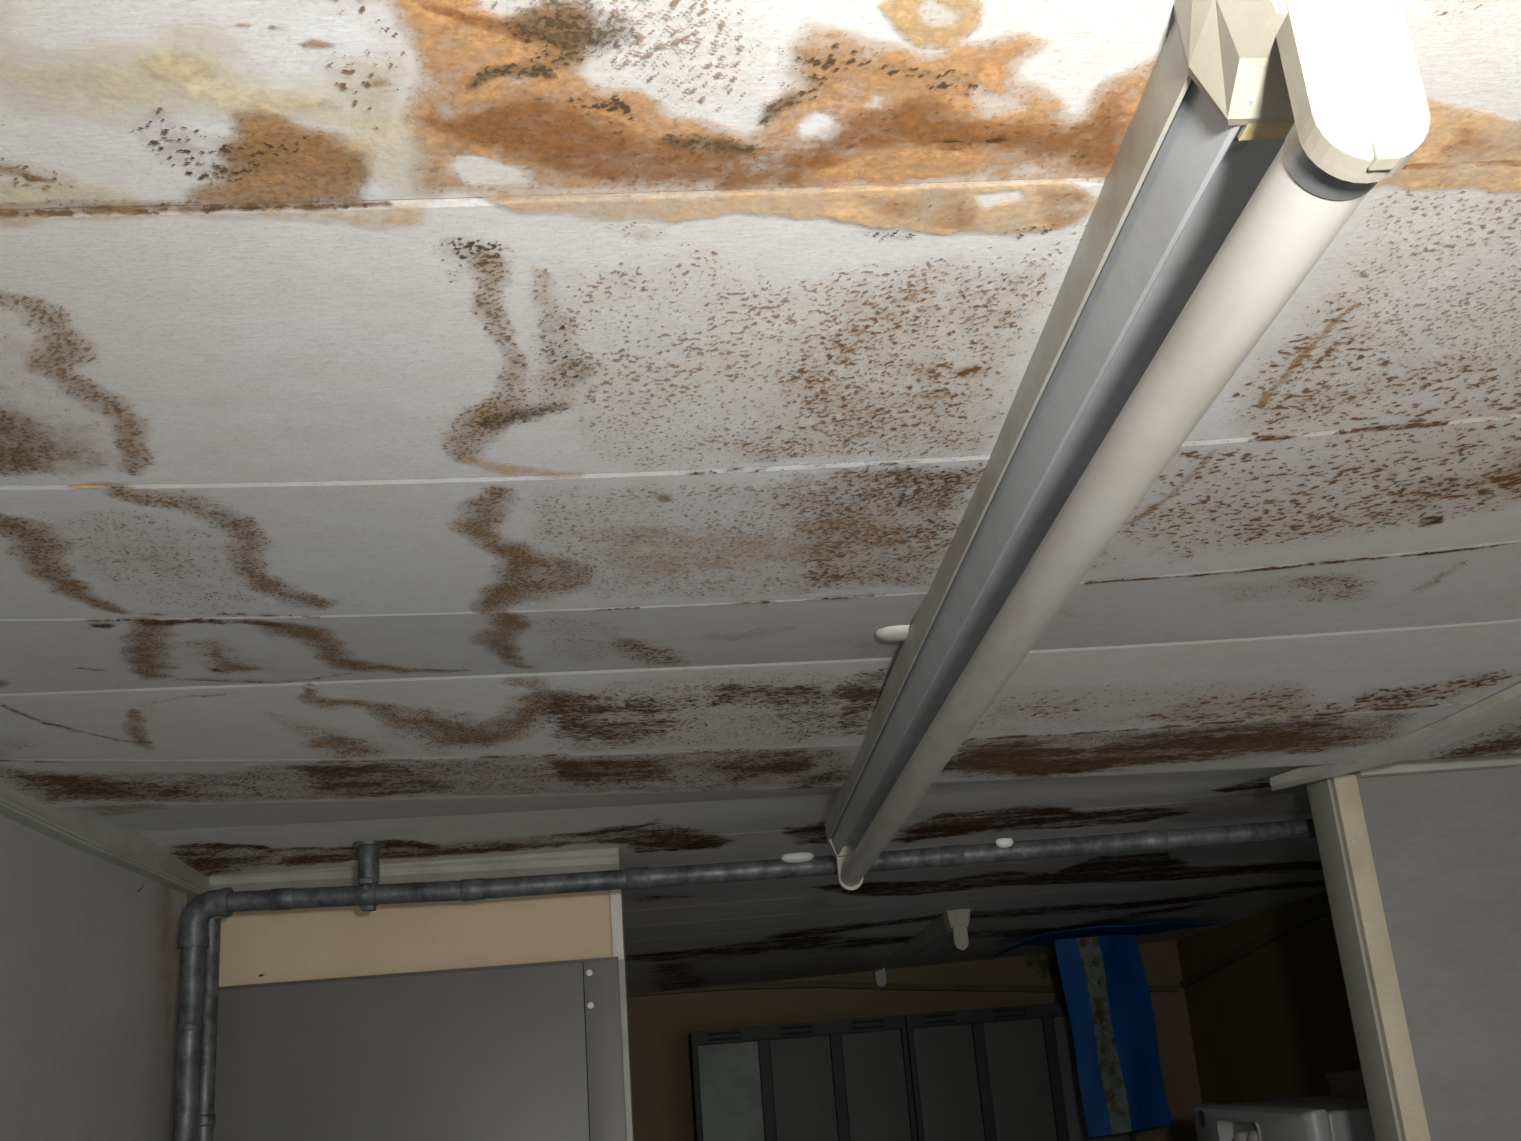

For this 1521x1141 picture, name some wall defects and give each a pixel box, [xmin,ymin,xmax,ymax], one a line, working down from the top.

leakage [1084,101,1521,601]
leakage [0,0,1154,816]
crack [2,694,225,750]
leakage [942,670,1521,779]
leakage [1213,777,1271,817]
leakage [166,843,358,878]
leakage [380,821,735,860]
leakage [783,822,828,845]
leakage [894,804,1205,843]